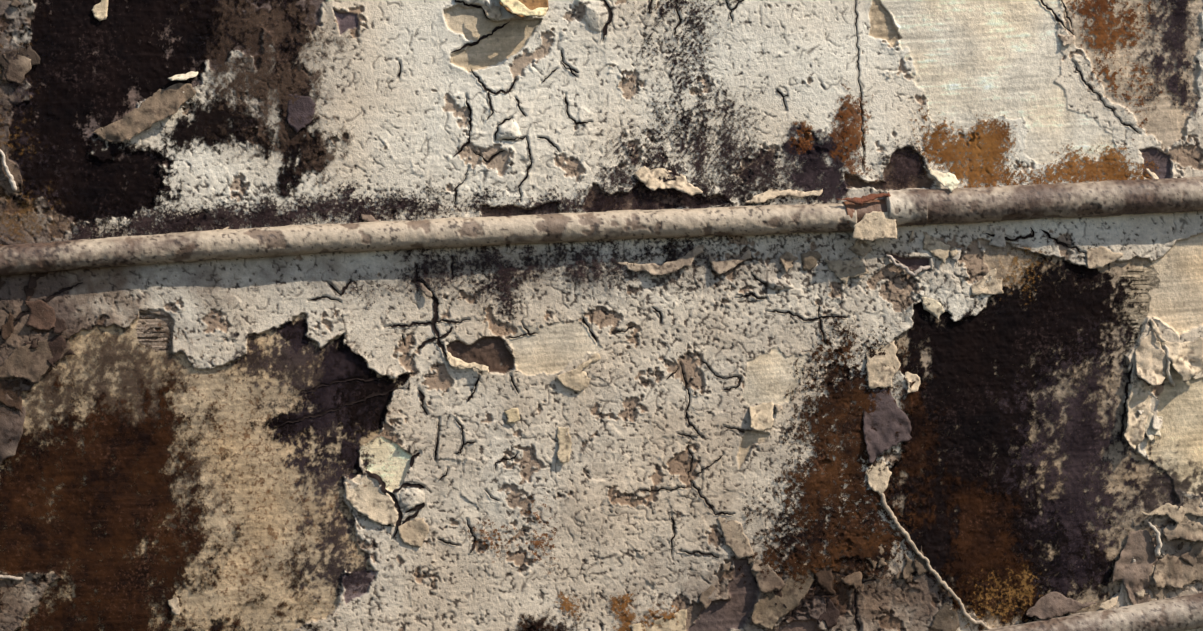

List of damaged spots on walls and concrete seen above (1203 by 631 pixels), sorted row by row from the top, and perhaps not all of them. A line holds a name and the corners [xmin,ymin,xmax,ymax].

peeling [73,20,275,196]
water stain [0,0,859,240]
crack [451,0,593,204]
corrosion [790,78,878,182]
corrosion [910,0,1174,188]
crack [384,254,471,361]
peeling [0,272,429,631]
crack [276,377,518,538]
crack [640,361,745,558]
peeling [863,295,961,538]
peeling [930,225,1203,631]
water stain [162,617,272,631]